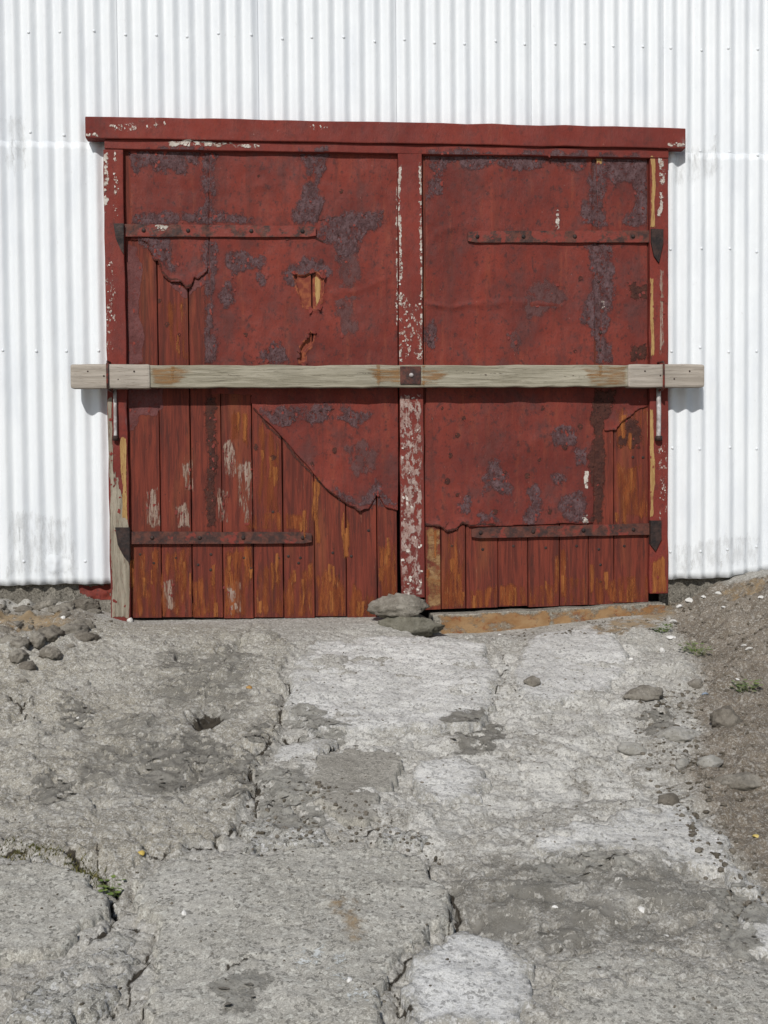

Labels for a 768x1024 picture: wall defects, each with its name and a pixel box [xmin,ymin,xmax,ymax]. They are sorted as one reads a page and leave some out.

peeling [283,145,666,364]
peeling [175,503,190,528]
peeling [182,396,252,527]
corrosion [232,409,360,557]
peeling [259,402,372,428]
peeling [331,395,423,595]
peeling [550,389,617,524]
peeling [618,409,667,517]
peeling [162,580,175,610]
crack [2,839,155,1020]
crack [386,957,413,1024]
crack [448,894,462,935]